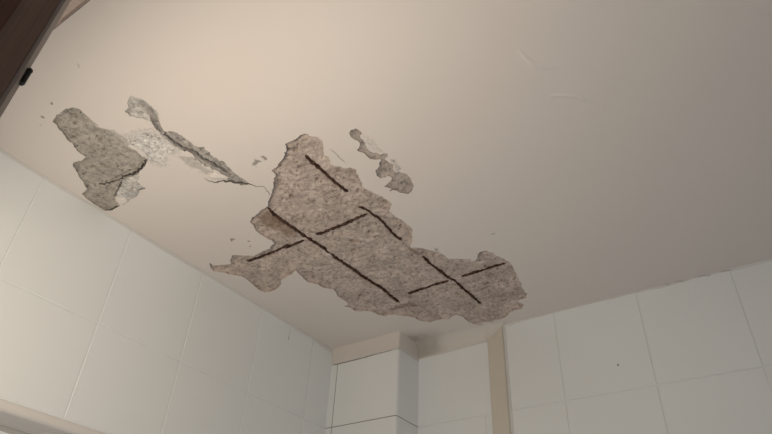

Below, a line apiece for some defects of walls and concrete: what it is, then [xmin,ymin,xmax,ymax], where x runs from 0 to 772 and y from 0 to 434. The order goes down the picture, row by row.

spalling [42,107,180,211]
crack [125,96,270,194]
spalling [210,129,527,325]